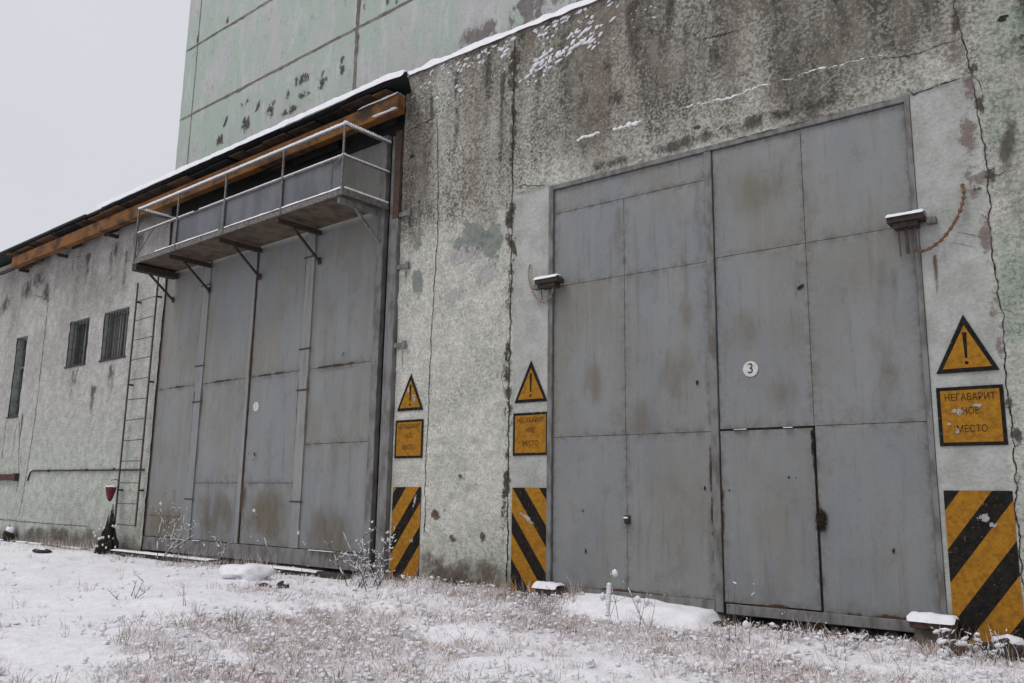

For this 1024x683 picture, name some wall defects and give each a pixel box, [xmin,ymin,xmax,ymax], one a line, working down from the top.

water stain [627,0,638,58]
peeling [241,70,328,132]
water stain [485,44,520,173]
water stain [660,131,708,152]
water stain [726,107,791,134]
crack [405,117,439,530]
water stain [505,201,517,313]
crack [500,40,547,585]
crack [888,0,1024,585]
water stain [502,338,512,429]
water stain [500,452,511,530]